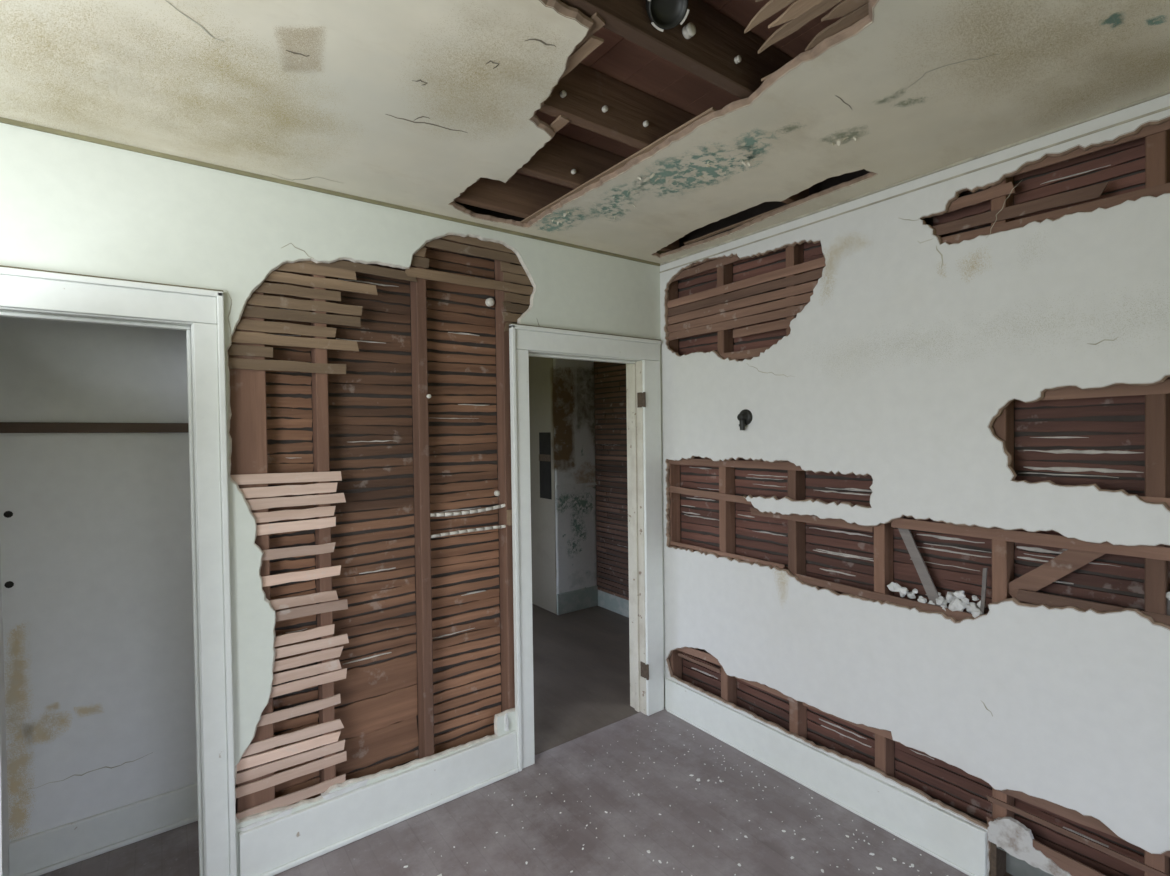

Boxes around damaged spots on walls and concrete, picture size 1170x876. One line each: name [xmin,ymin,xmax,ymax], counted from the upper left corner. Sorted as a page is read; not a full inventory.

flaking render [448,0,879,233]
flaking render [664,239,826,362]
flaking render [652,169,877,258]
flaking render [920,116,1170,245]
flaking render [988,374,1170,512]
flaking render [226,232,537,832]
flaking render [665,455,1170,631]
flaking render [666,647,1170,876]